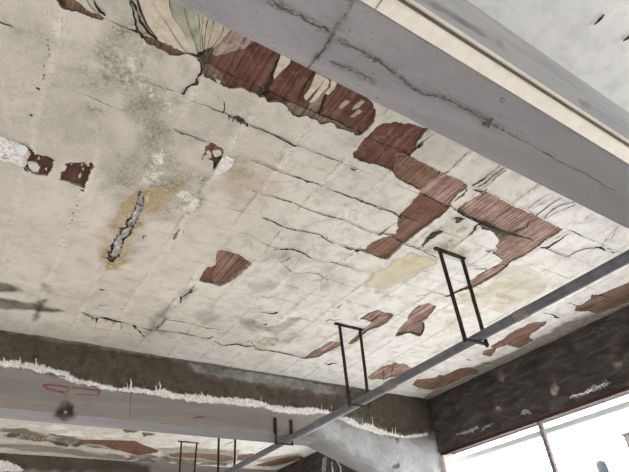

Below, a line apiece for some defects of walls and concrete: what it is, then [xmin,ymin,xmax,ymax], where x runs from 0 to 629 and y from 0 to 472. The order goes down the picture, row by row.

crack [59,0,194,55]
peeling [0,136,53,175]
spalling [61,162,94,192]
spalling [137,0,561,290]
crack [542,152,615,191]
water stain [366,248,436,290]
spalling [575,282,629,313]
crack [82,289,304,359]
spalling [350,310,392,343]
spalling [396,303,435,335]
spalling [482,321,546,355]
spalling [413,367,478,389]